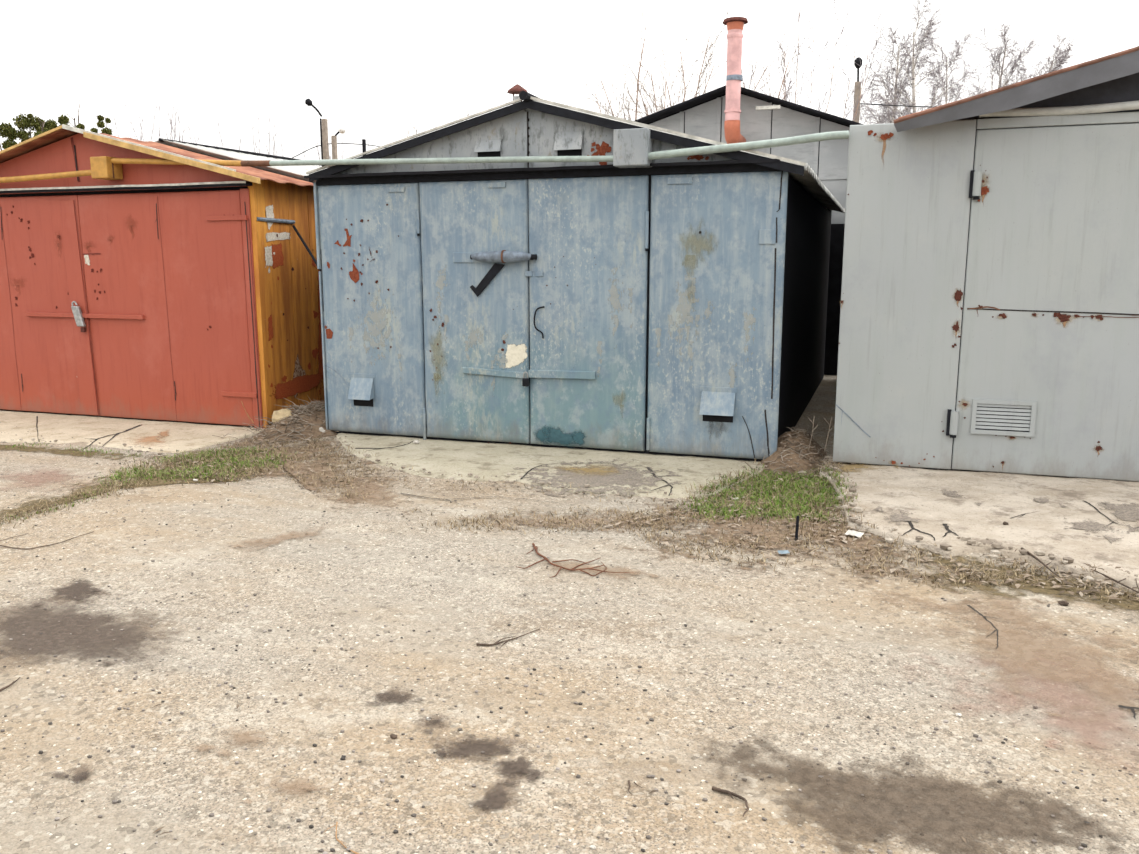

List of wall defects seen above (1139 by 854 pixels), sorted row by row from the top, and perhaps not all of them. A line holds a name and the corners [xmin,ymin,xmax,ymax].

rust [587,141,611,165]
rust [868,130,894,156]
rust [335,228,363,283]
rust [952,290,963,348]
rust [1032,313,1139,327]
peeling [492,332,527,369]